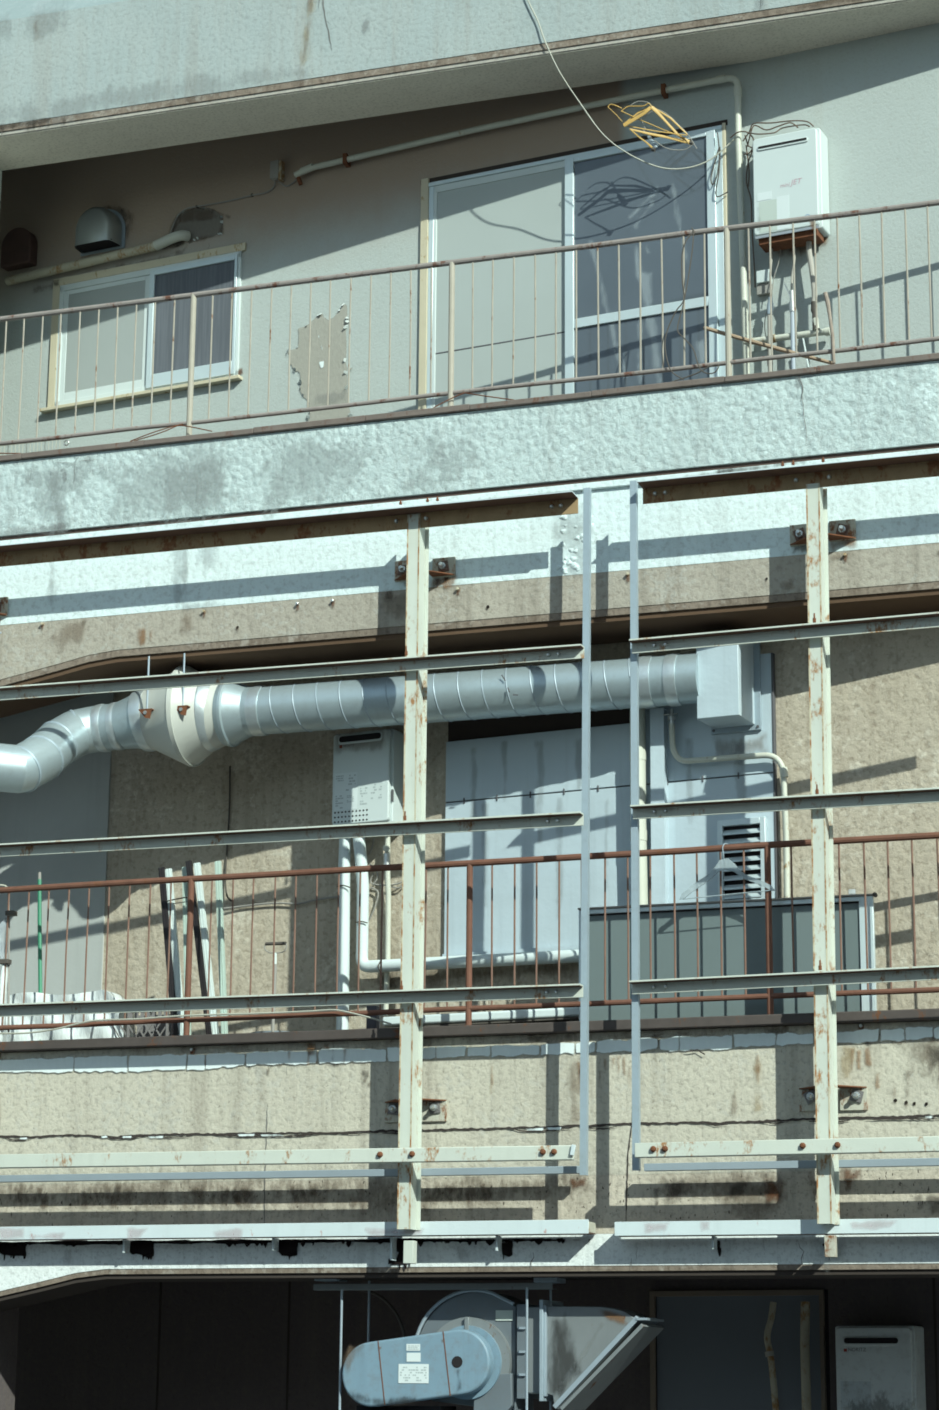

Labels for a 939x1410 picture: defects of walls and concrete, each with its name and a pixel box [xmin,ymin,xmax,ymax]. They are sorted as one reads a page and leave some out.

peeling [286,303,353,422]
crack [0,1112,939,1223]